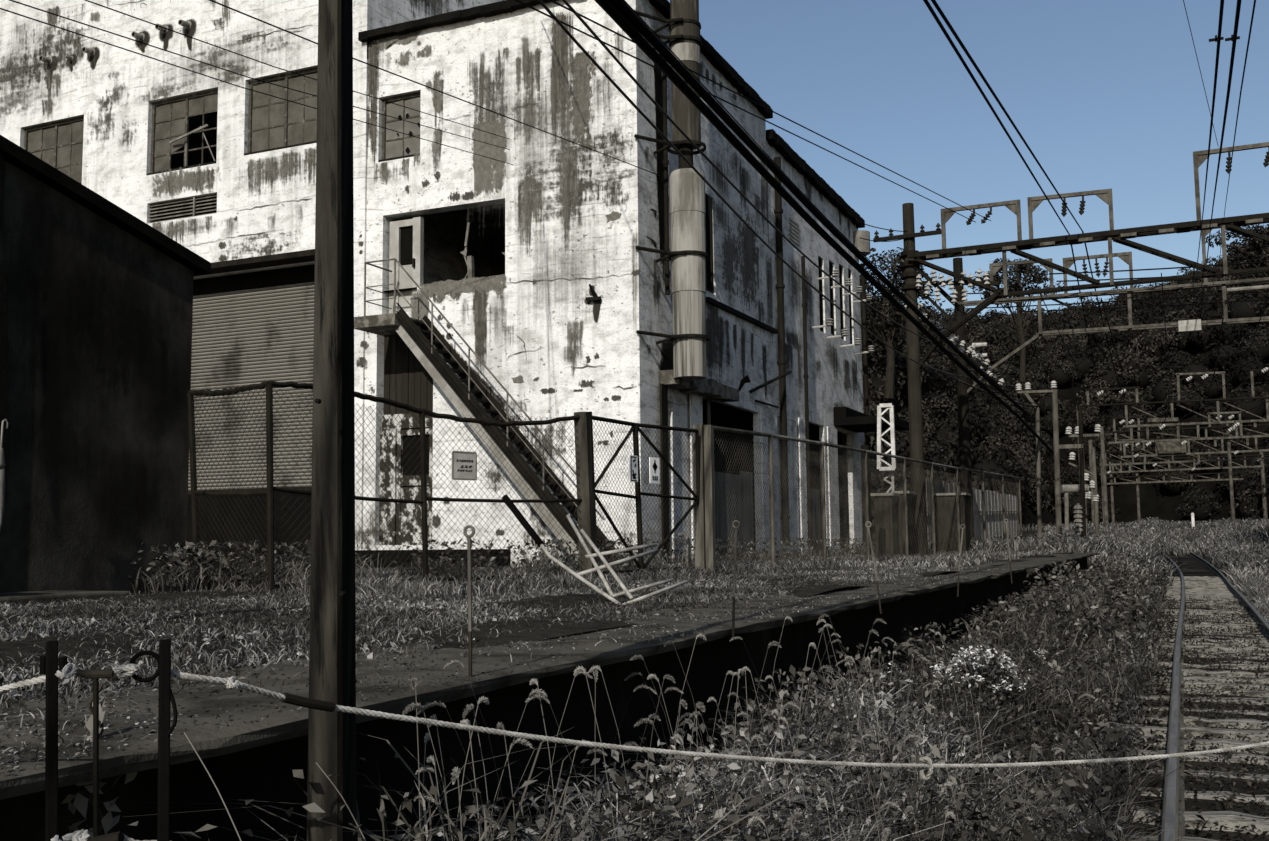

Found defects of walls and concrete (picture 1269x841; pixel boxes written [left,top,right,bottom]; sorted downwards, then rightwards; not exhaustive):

water stain [410,0,464,18]
water stain [0,6,83,116]
water stain [367,40,420,184]
water stain [247,148,316,194]
water stain [469,12,665,310]
water stain [708,150,769,243]
water stain [440,290,566,461]
water stain [564,321,583,373]
water stain [706,260,813,399]
water stain [815,341,857,408]
water stain [355,505,383,550]